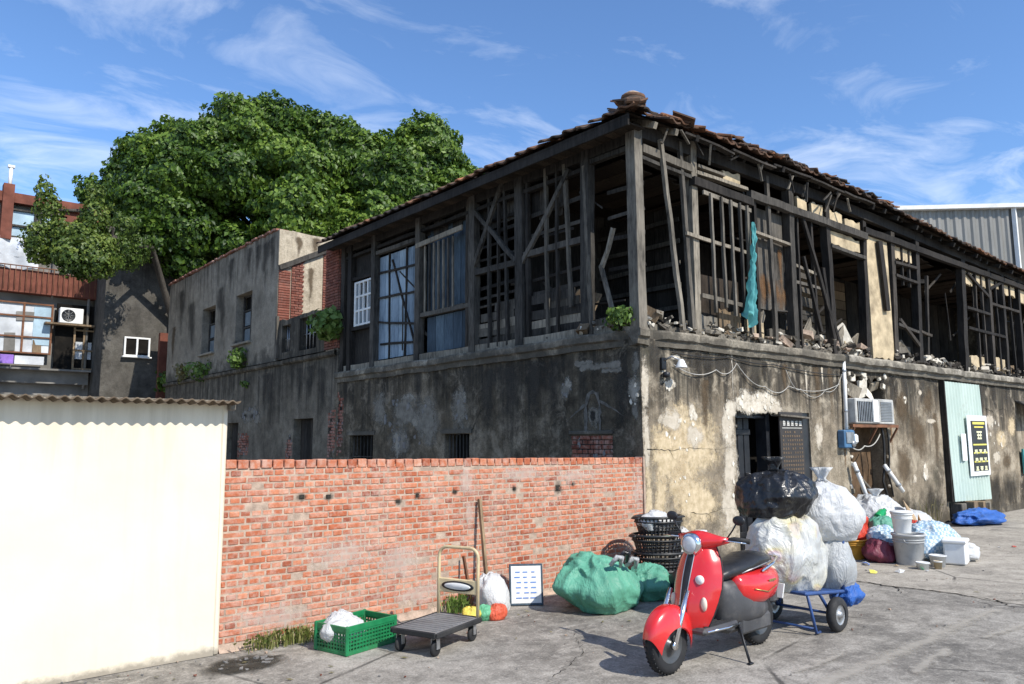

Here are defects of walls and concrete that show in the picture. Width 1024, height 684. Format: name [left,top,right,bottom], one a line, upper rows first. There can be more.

leakage [248,238,274,275]
leakage [172,292,193,353]
leakage [218,259,234,324]
peeling [561,352,783,530]